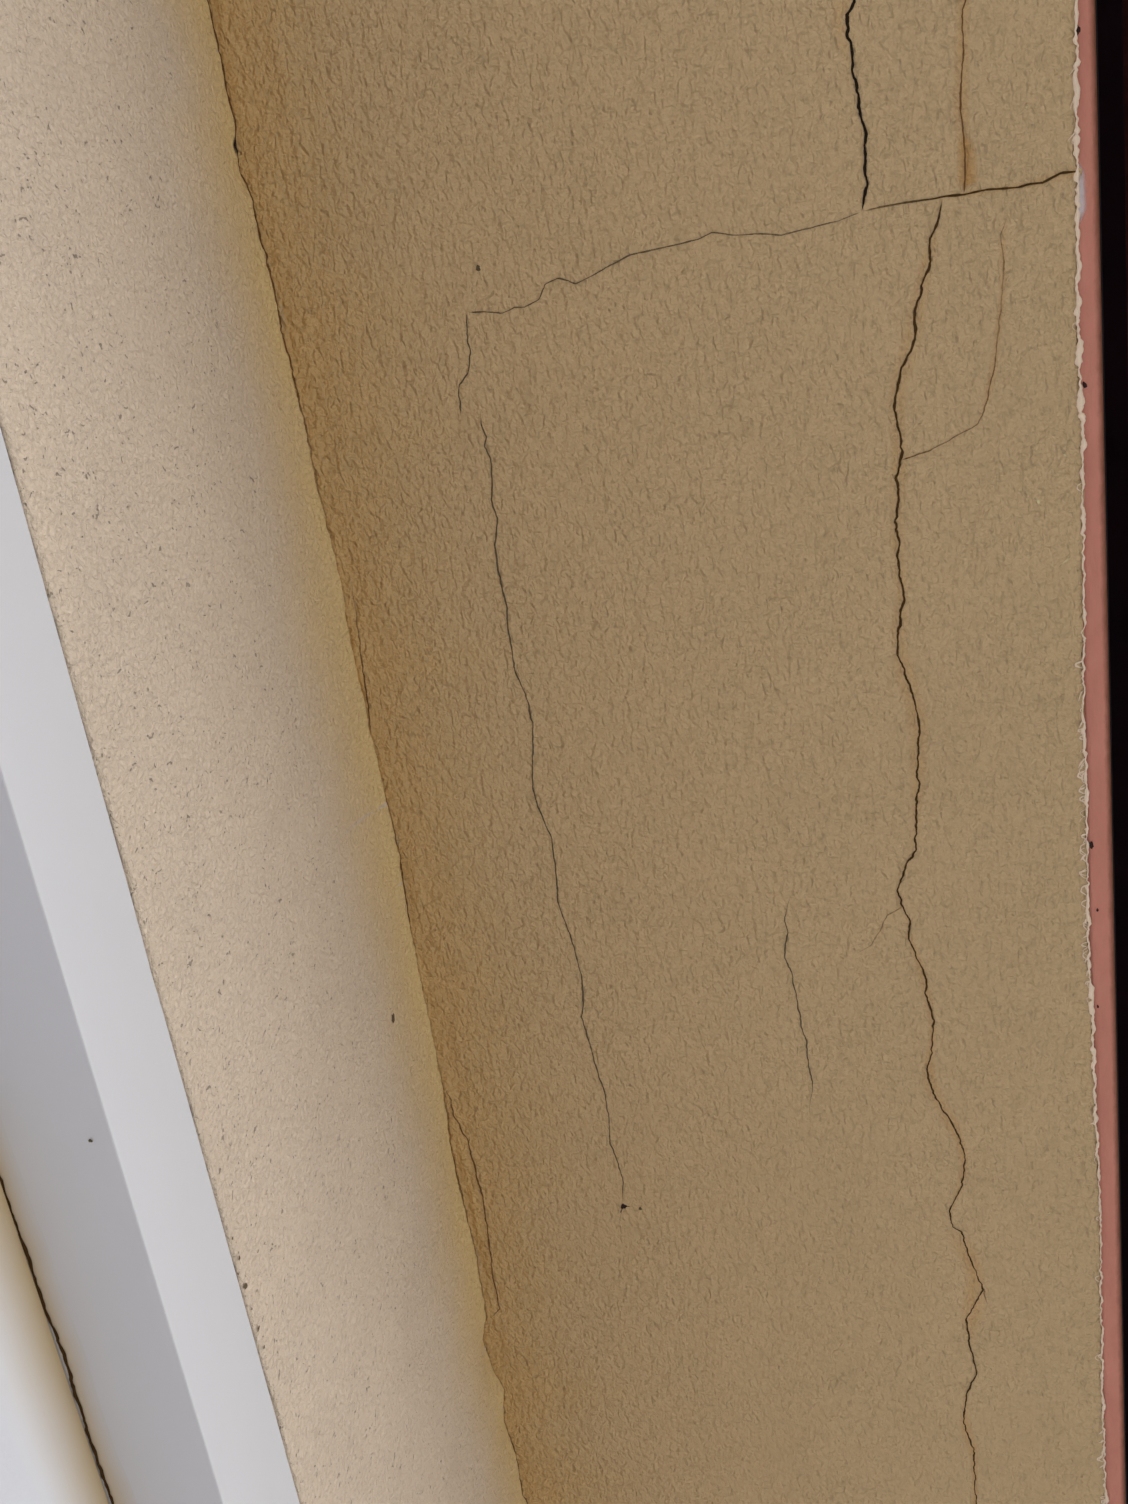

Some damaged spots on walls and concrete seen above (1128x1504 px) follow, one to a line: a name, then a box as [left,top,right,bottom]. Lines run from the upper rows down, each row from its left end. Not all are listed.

crack [207,0,316,474]
crack [356,622,371,729]
crack [458,0,1076,1504]
crack [391,819,411,930]
crack [444,1094,500,1315]